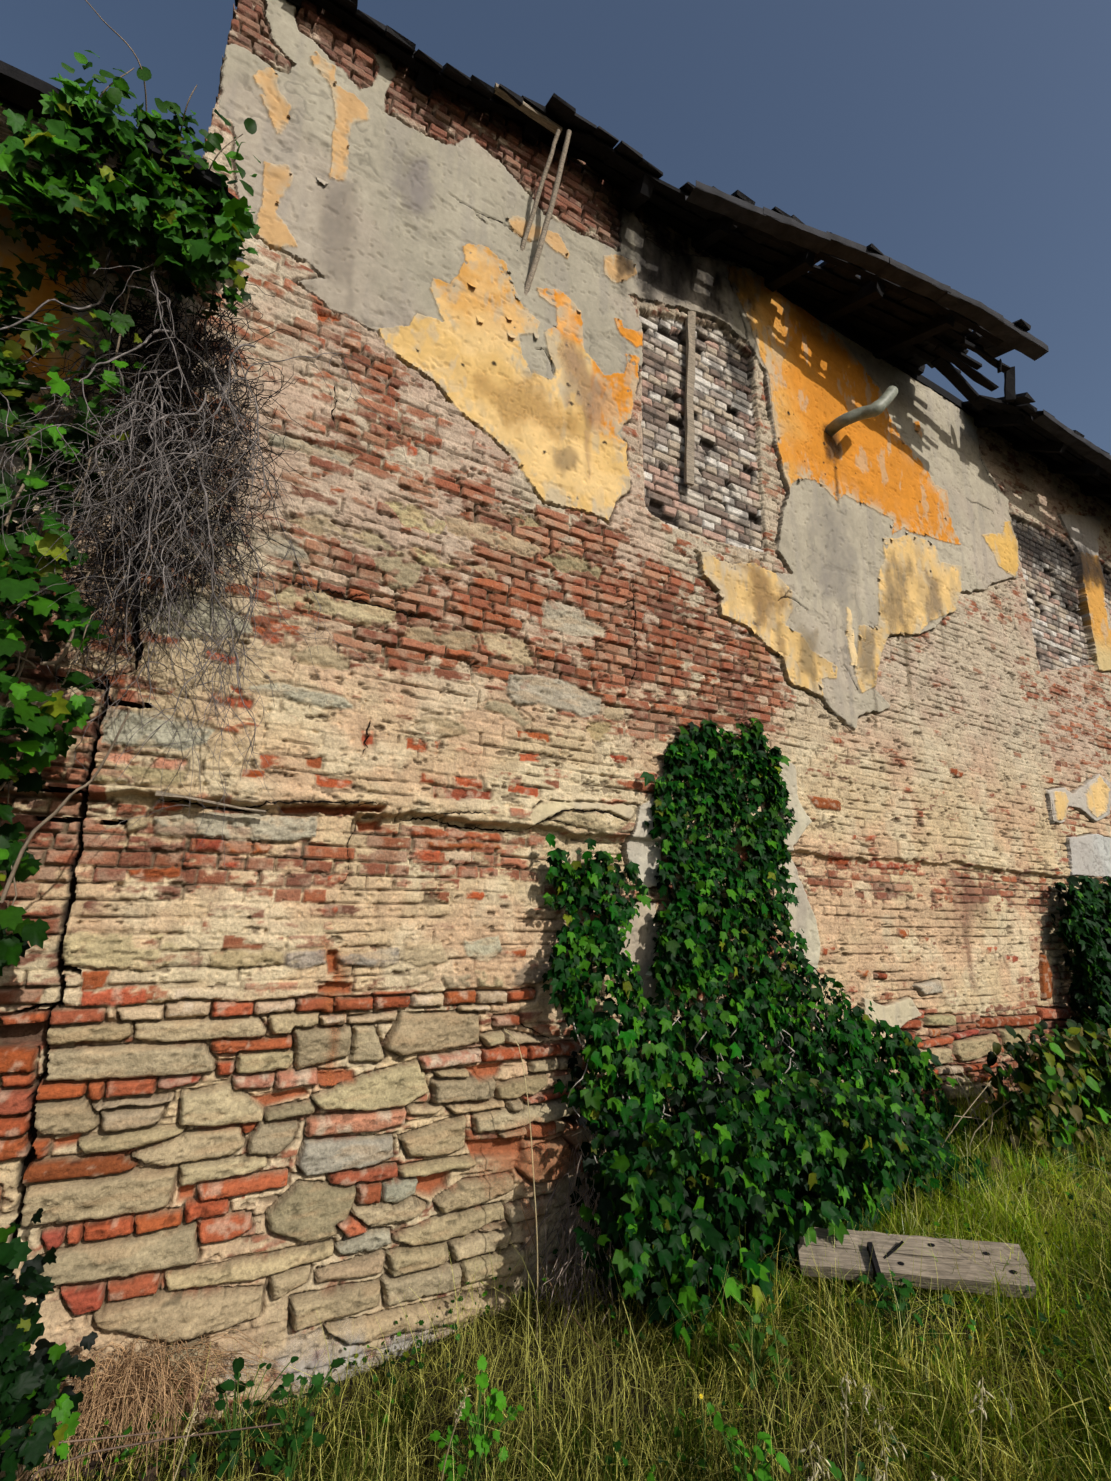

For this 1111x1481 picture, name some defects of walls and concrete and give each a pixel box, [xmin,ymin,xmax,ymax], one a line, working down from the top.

spalling [227,0,637,282]
peeling [379,243,643,520]
peeling [700,264,962,698]
crack [272,573,426,619]
peeling [982,521,1020,576]
peeling [1083,555,1111,671]
crack [12,557,152,1239]
crack [160,799,625,884]
peeling [1054,776,1110,820]